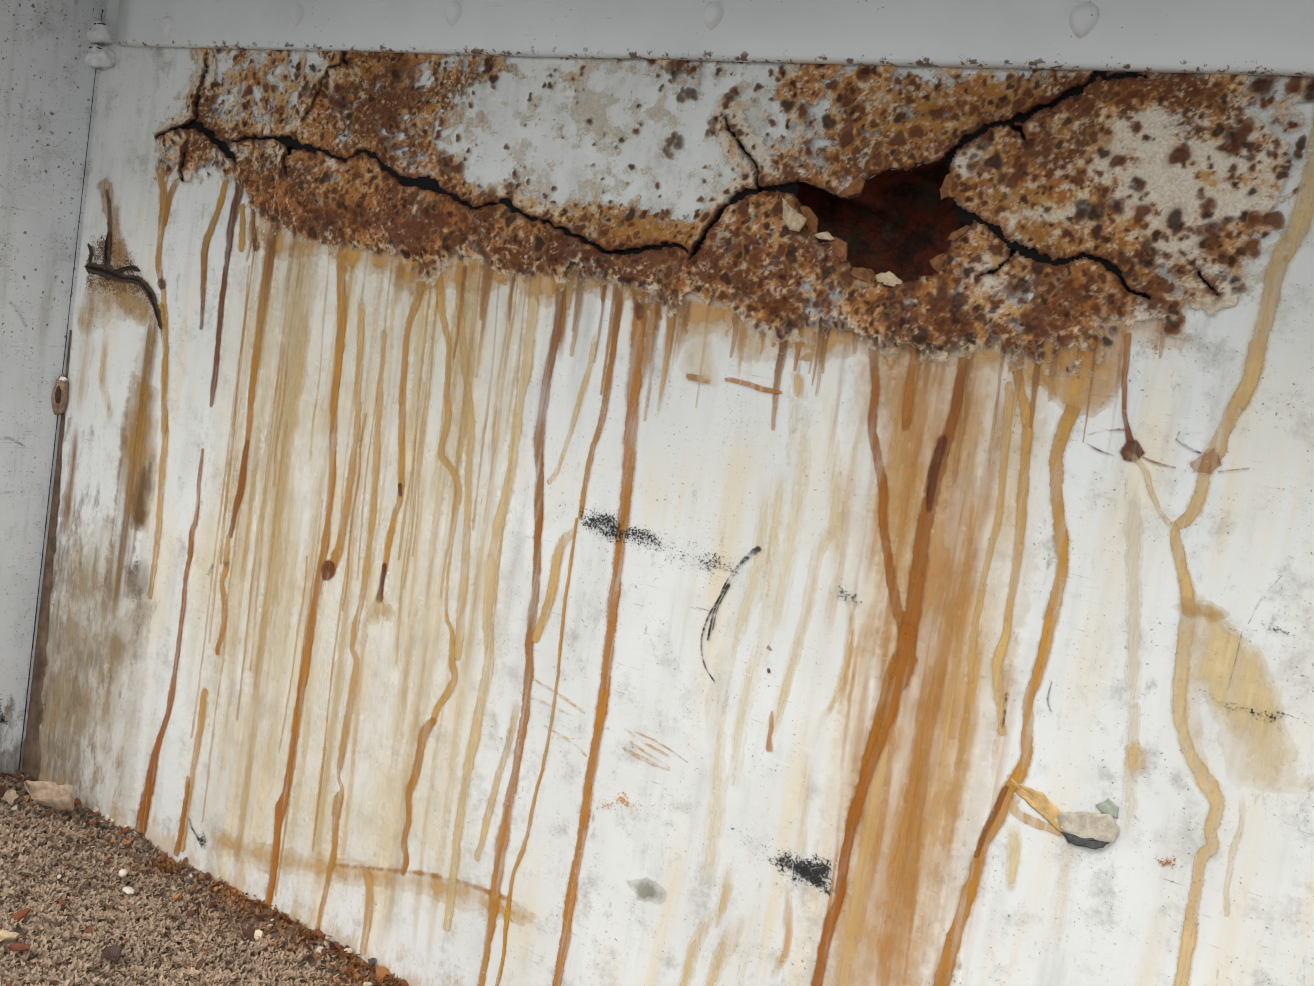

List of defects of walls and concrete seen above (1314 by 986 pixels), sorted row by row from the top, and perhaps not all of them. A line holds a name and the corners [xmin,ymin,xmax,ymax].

crack [62,9,162,373]
crack [156,62,799,257]
spalling [795,158,966,288]
crack [945,71,1146,167]
crack [953,204,1151,300]
crack [1198,271,1219,296]
crack [18,415,58,770]
rust [64,440,76,520]
rust [85,126,1227,986]
rust [1164,118,1314,986]